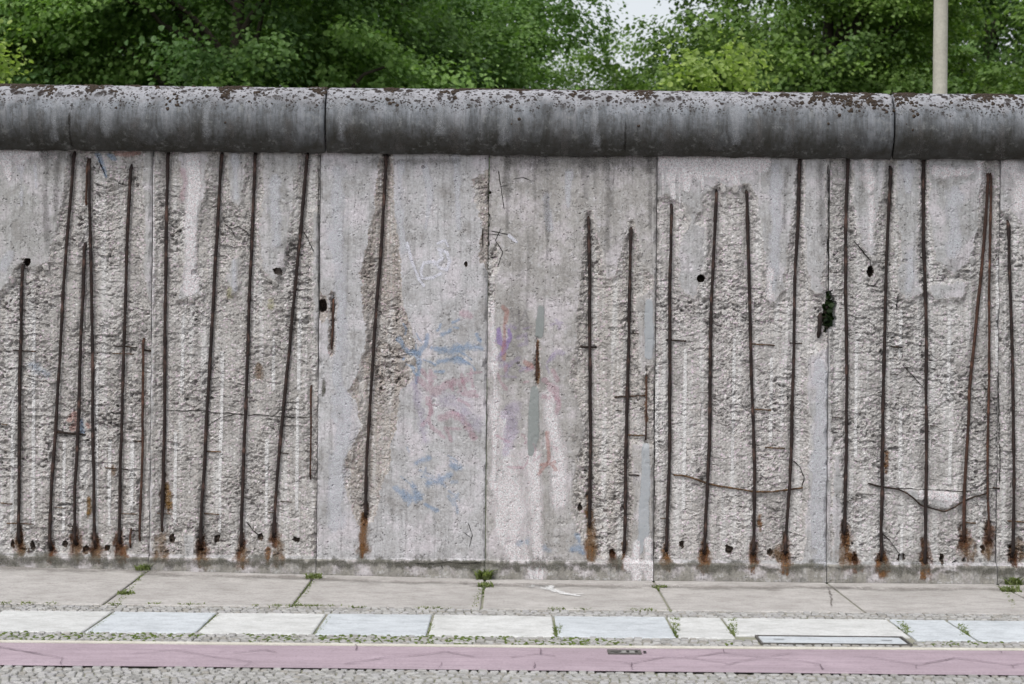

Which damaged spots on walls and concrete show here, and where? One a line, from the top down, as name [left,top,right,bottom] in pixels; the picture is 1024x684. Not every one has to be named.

spalling [0,150,339,556]
spalling [340,154,421,526]
spalling [532,336,543,388]
spalling [567,149,1024,563]
rust [70,526,128,563]
rust [196,529,208,566]
rust [357,502,371,557]
rust [584,495,629,567]
rust [698,539,712,573]
rust [839,522,859,573]
rust [875,548,889,578]
rust [957,521,994,562]